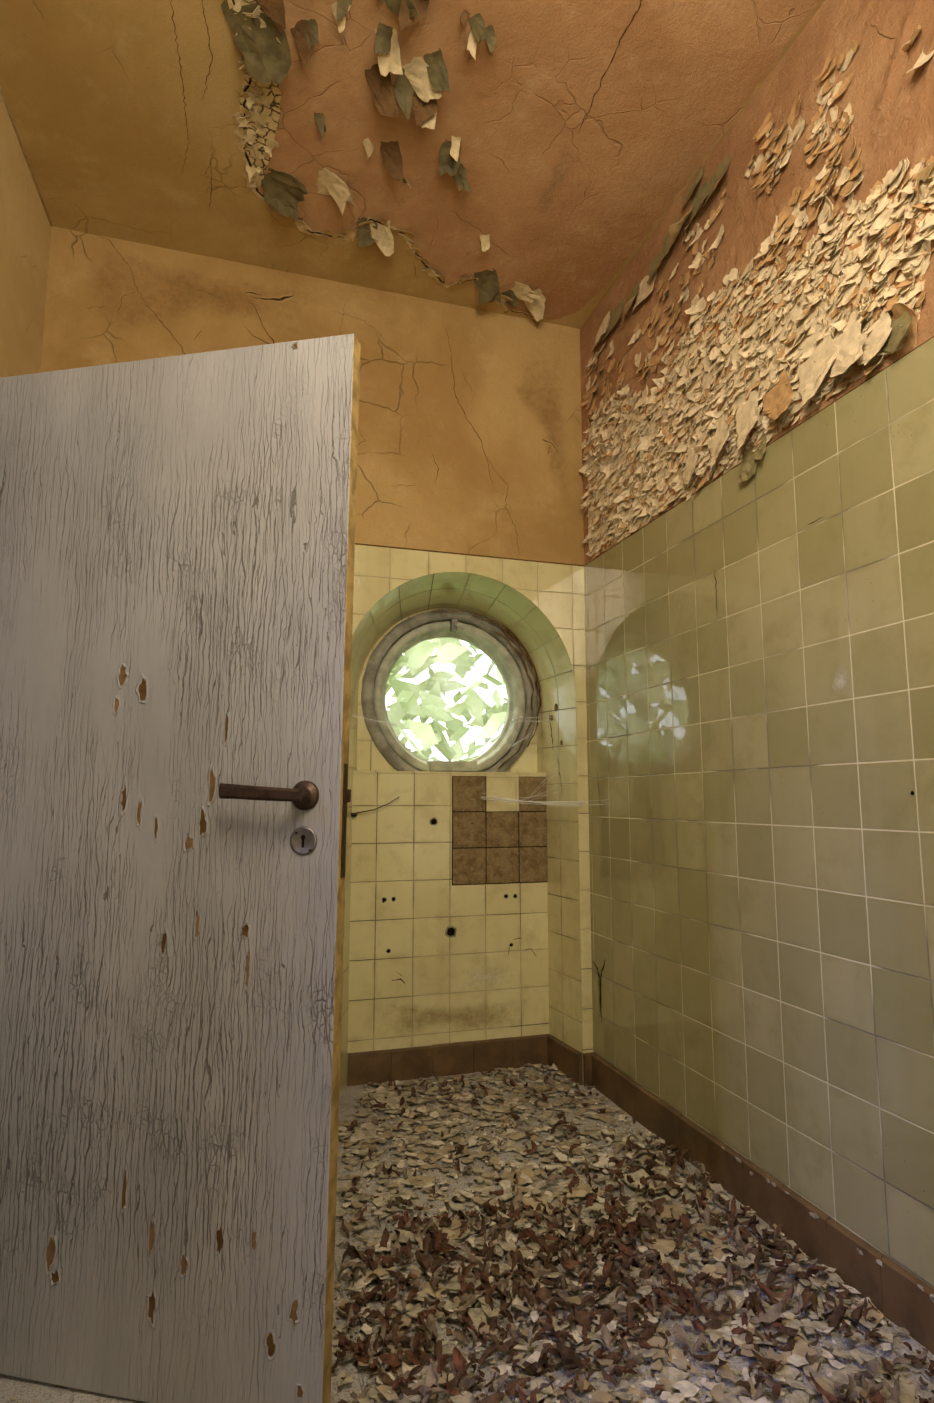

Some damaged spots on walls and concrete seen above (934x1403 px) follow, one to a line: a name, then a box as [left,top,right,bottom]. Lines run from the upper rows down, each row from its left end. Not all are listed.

crack [169,0,214,208]
crack [578,0,641,133]
crack [88,234,198,355]
crack [183,282,276,344]
peeling [221,0,934,559]
crack [446,328,520,554]
peeling [452,776,548,886]